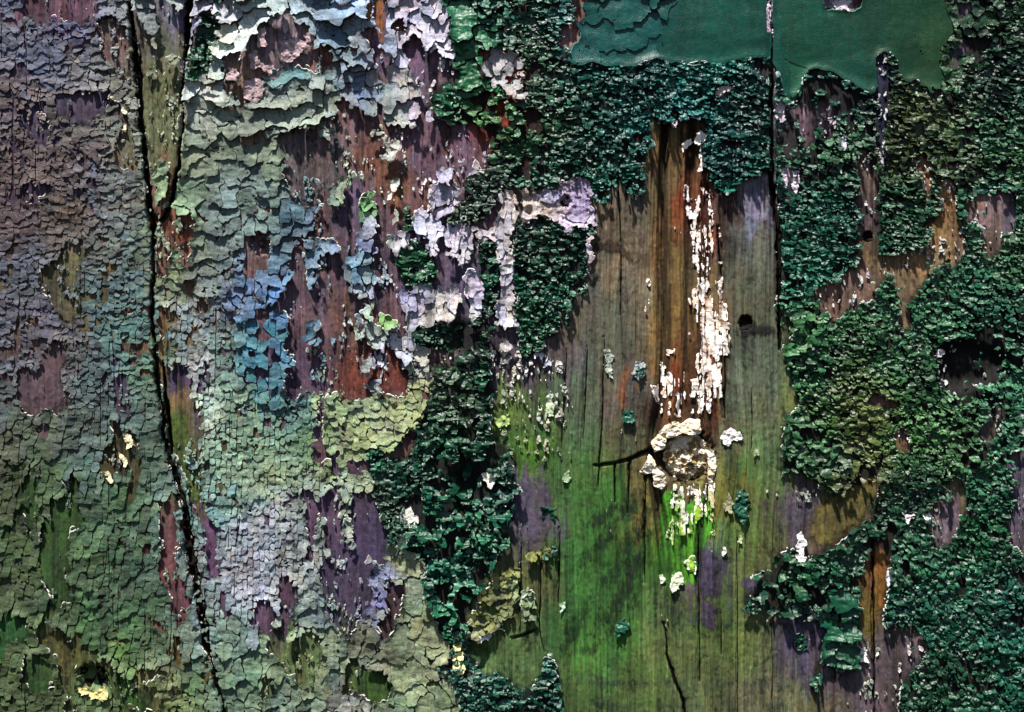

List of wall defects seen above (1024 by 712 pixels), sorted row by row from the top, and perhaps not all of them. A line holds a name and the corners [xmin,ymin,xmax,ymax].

crack [128,0,225,712]
peeling [0,0,772,712]
crack [561,342,651,578]
crack [664,520,738,712]
peeling [656,0,1024,712]